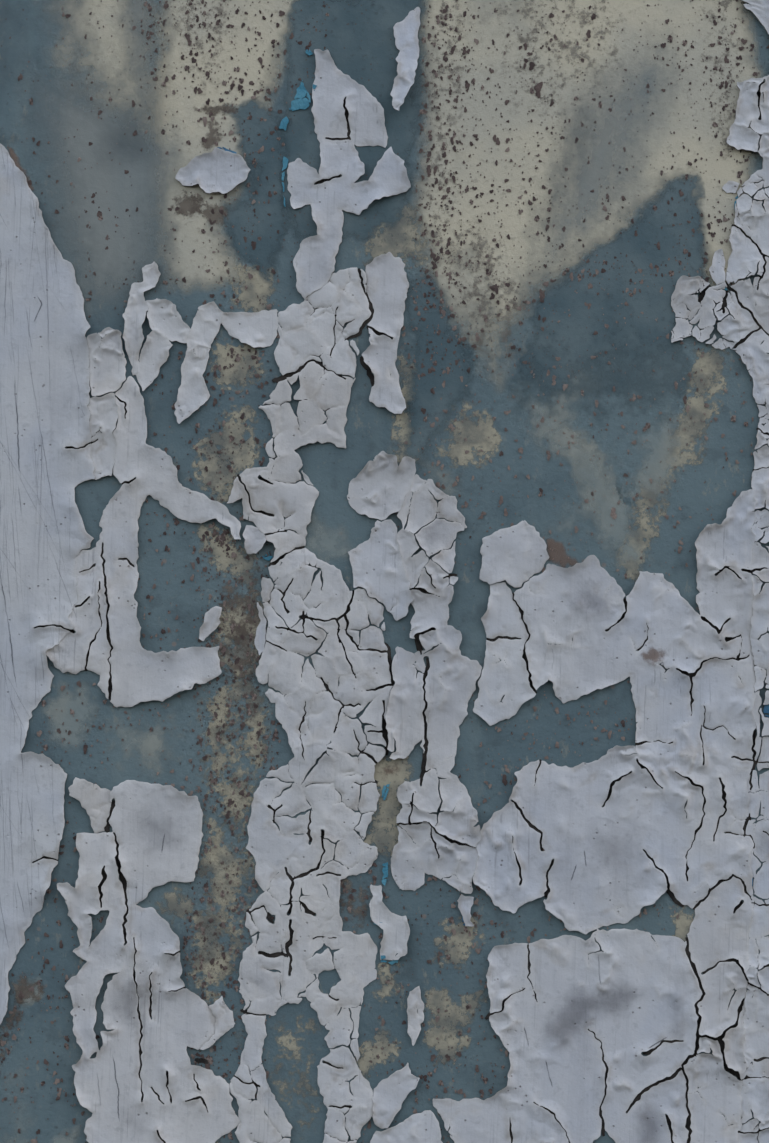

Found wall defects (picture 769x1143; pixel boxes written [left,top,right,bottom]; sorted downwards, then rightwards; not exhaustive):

corrosion [64,0,329,310]
corrosion [149,337,277,501]
corrosion [397,0,769,576]
crack [698,224,769,348]
corrosion [0,867,87,1143]
corrosion [37,499,281,1080]
peeling [0,0,443,1143]
crack [246,810,341,975]
crack [237,474,476,858]
crack [487,593,537,693]
crack [533,937,769,1143]
crack [603,616,769,913]